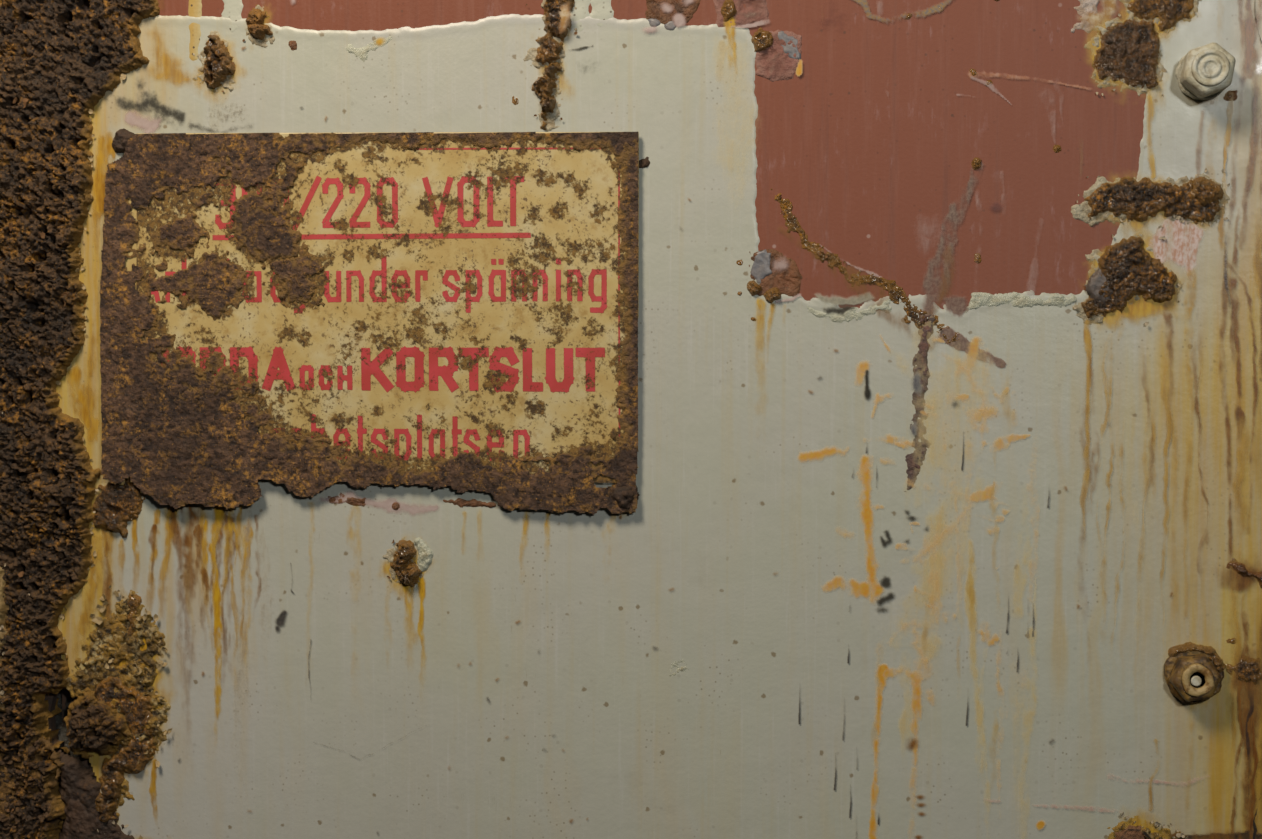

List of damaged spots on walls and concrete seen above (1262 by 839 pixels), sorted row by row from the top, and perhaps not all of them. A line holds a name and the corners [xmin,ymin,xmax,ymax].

peeling [1071,0,1116,33]
peeling [807,283,904,323]
peeling [944,292,1077,316]
rust [1071,0,1262,591]
rust [0,0,650,839]
rust [799,448,845,461]
rust [857,362,889,416]
rust [823,455,908,612]
rust [954,542,999,676]
rust [869,660,933,839]
rust [1225,610,1262,839]